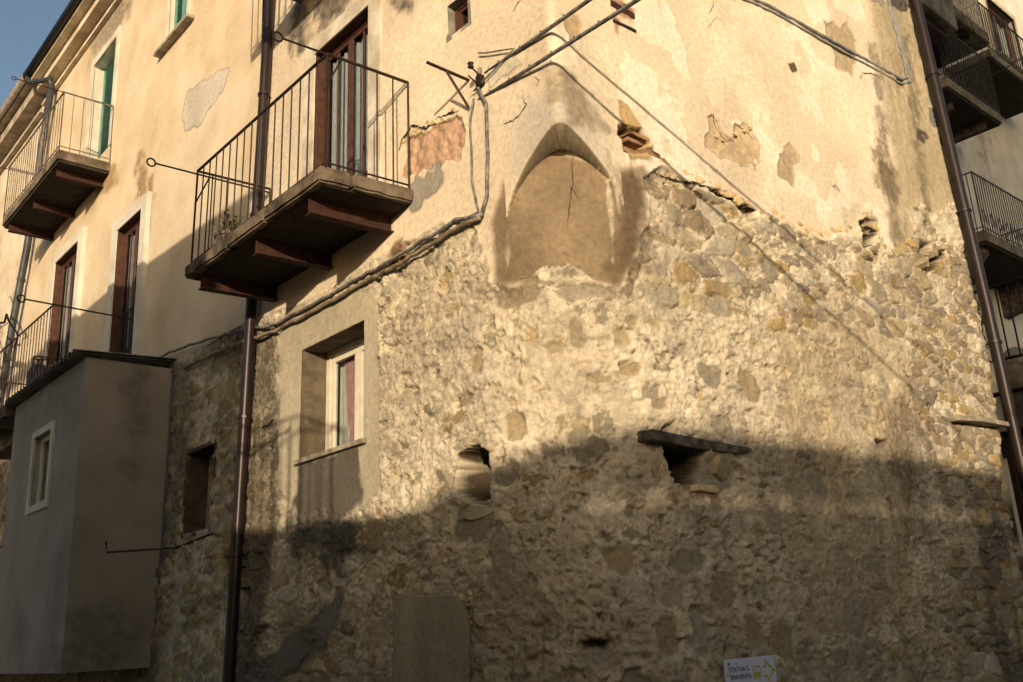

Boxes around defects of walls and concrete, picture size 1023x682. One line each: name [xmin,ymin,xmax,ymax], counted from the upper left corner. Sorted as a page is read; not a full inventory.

leakage [289,0,347,53]
flaking render [182,68,230,131]
flaking render [402,107,465,212]
crack [566,160,579,235]
crack [653,168,755,213]
flaking render [704,116,760,170]
flaking render [778,143,799,187]
leakage [875,79,898,246]